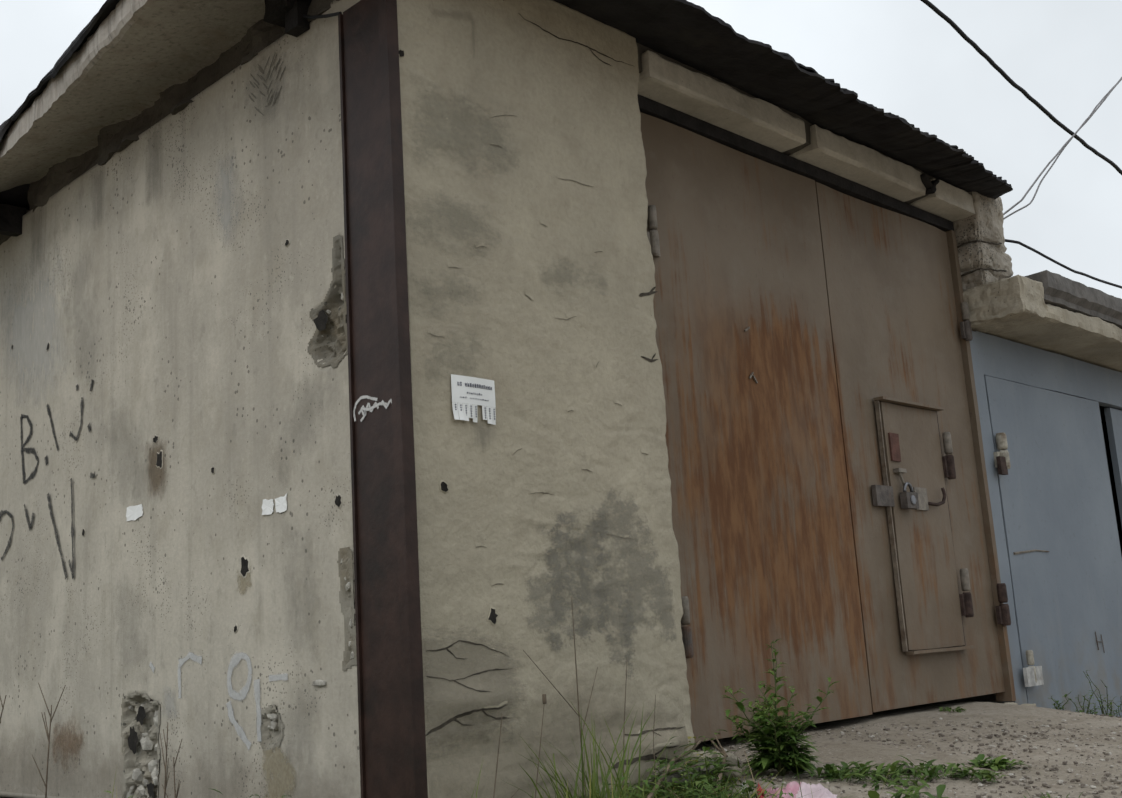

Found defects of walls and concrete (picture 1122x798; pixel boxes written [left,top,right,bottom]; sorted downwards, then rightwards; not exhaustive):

crack [518,10,635,67]
spalling [307,234,348,368]
rust [149,447,164,490]
crack [424,636,513,736]
spalling [121,692,161,798]